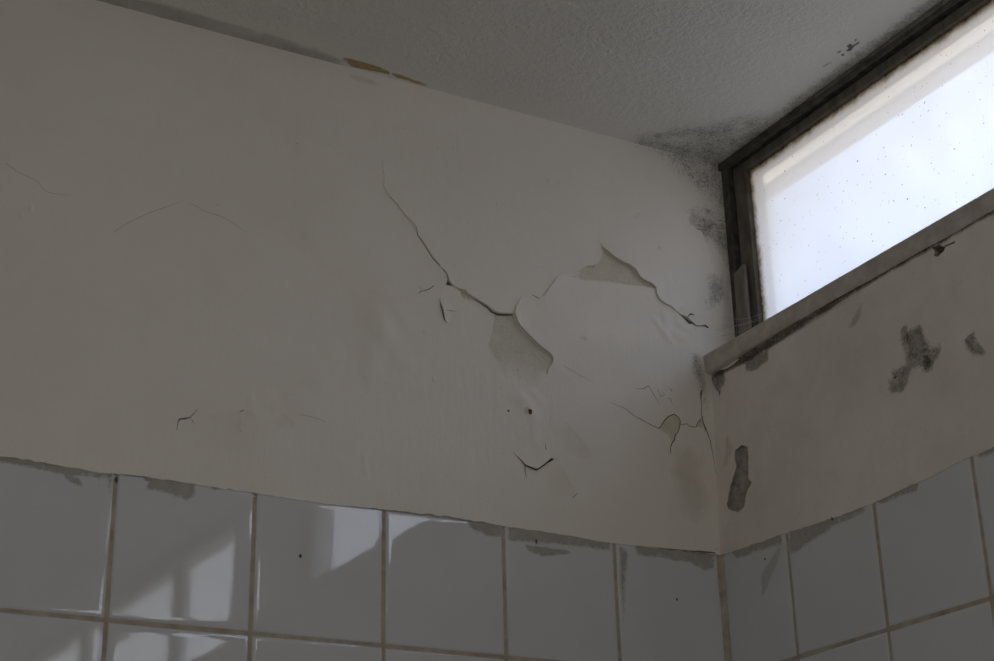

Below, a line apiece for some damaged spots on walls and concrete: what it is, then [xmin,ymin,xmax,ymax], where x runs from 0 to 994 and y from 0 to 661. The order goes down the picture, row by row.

peeling [382,145,709,387]
crack [610,386,720,471]
flaking render [730,446,752,512]